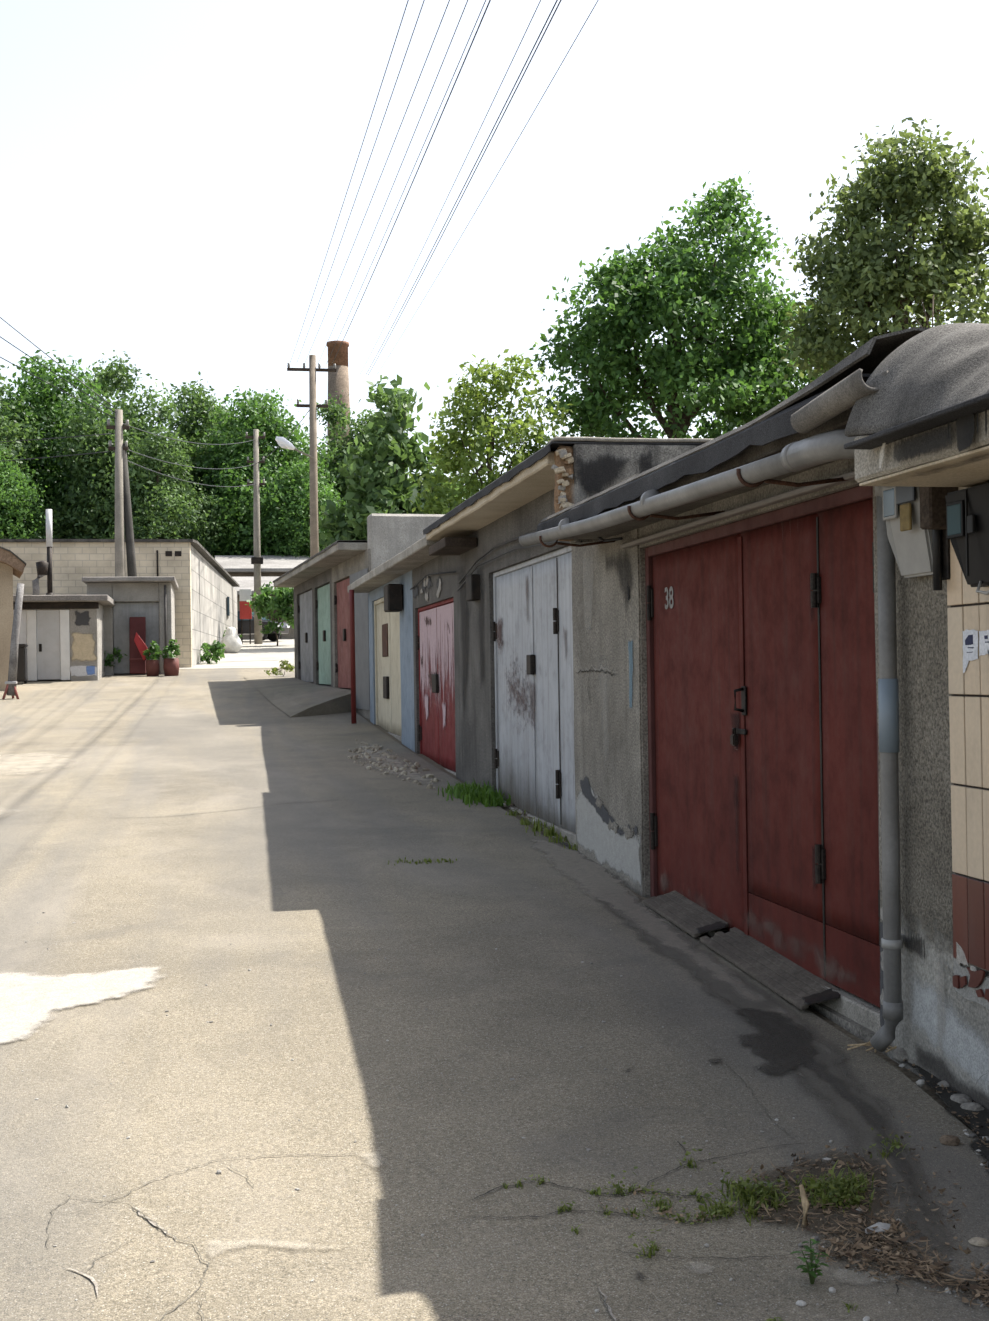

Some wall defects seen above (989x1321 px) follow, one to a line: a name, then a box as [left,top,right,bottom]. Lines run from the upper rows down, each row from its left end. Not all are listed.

peeling [413,576,455,725]
spalling [576,777,641,886]
spalling [952,942,989,1010]
crack [46,1153,416,1321]
crack [469,1180,741,1222]